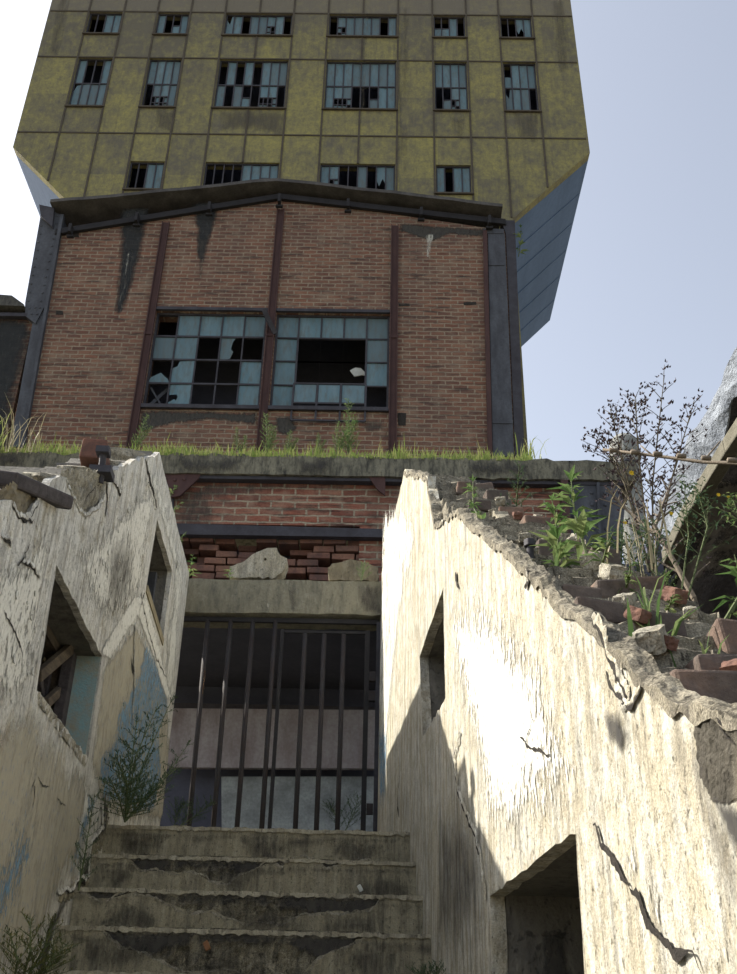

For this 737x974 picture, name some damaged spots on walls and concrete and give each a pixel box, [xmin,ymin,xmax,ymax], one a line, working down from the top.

leakage [116,208,146,312]
leakage [195,203,216,267]
crack [4,610,23,656]
peeling [0,468,384,974]
crack [593,823,701,972]